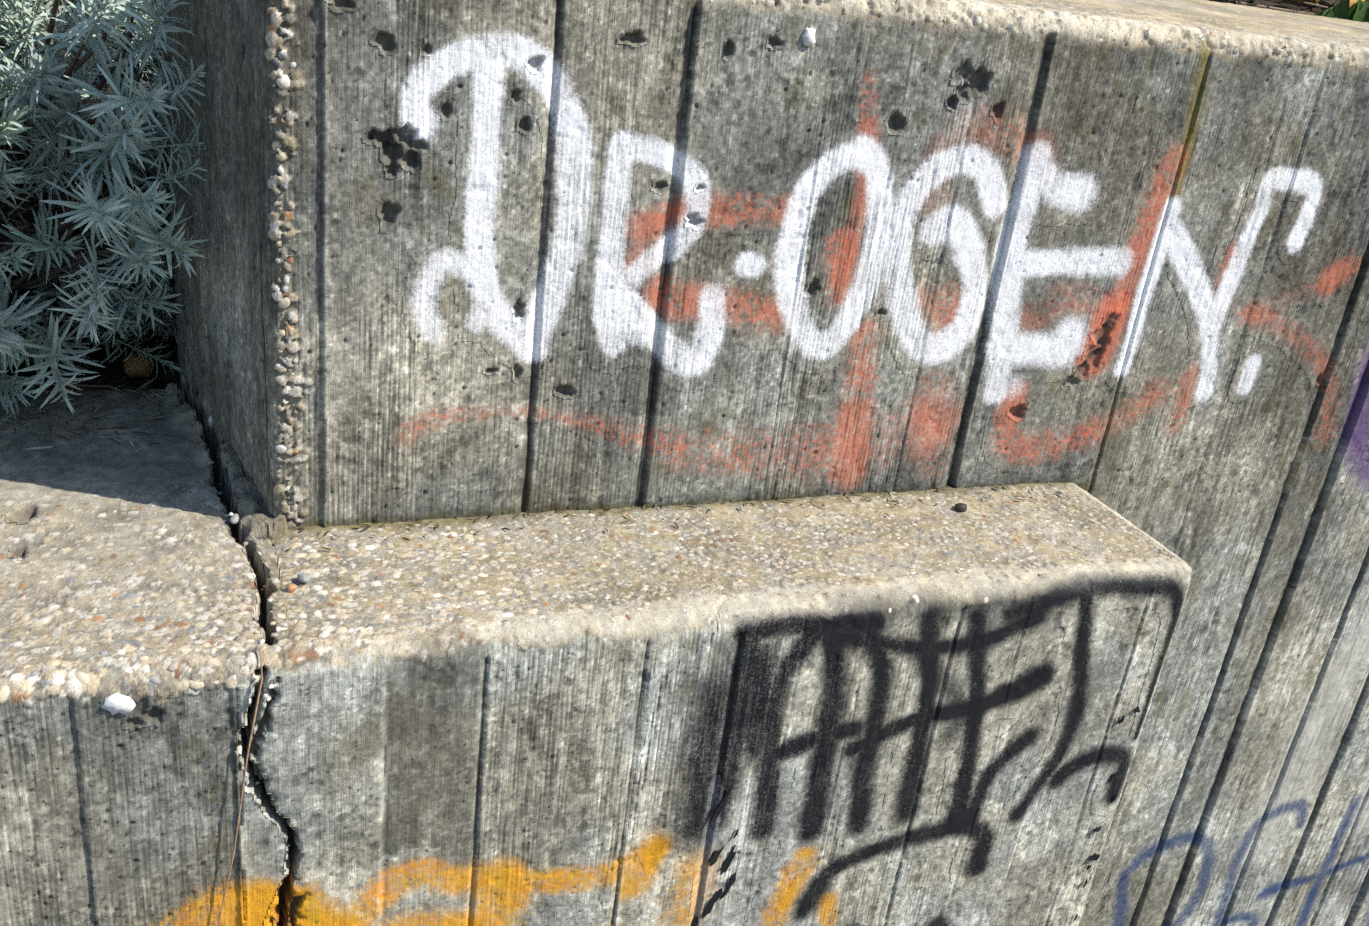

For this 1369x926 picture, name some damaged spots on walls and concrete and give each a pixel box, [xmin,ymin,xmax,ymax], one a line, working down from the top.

crack [174,241,310,920]